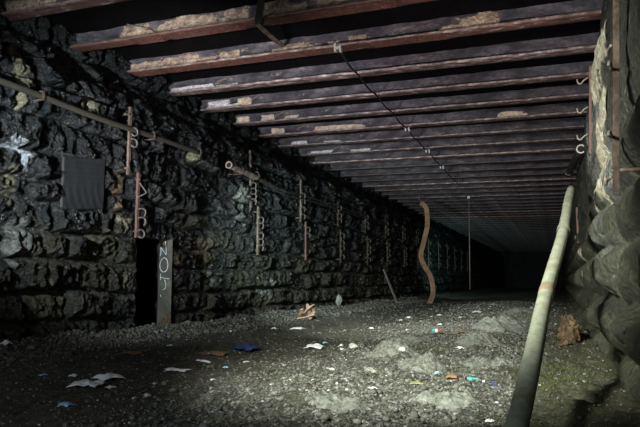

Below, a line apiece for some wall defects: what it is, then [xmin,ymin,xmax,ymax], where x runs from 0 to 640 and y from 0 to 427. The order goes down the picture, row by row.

peeling [120,5,250,38]
spalling [439,11,500,31]
peeling [130,49,240,70]
water stain [586,22,620,213]
corrosion [538,282,555,297]